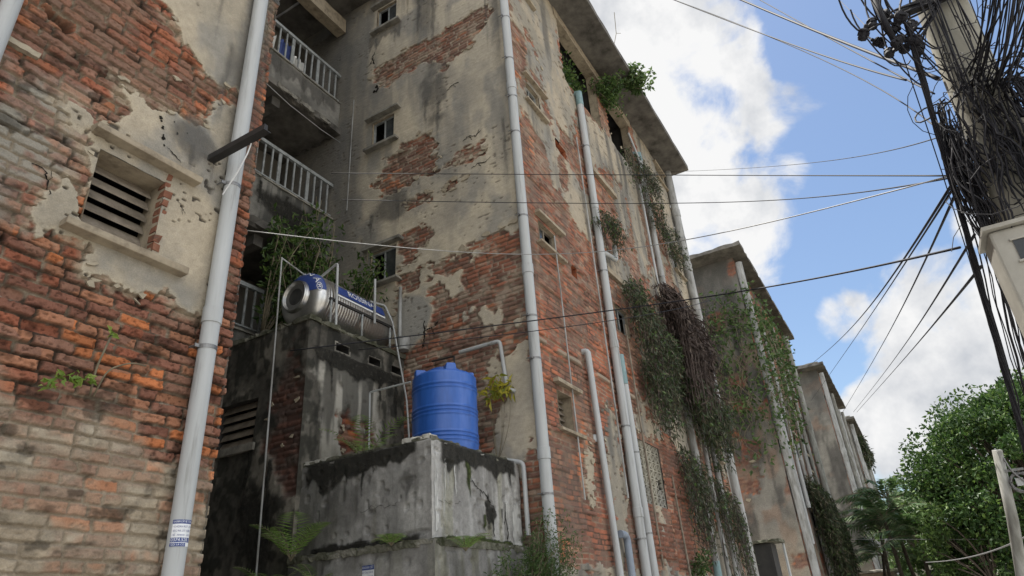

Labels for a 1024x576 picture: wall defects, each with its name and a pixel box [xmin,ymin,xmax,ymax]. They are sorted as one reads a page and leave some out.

flaking render [367,4,494,88]
flaking render [369,129,488,212]
flaking render [0,0,239,466]
flaking render [200,0,331,474]
flaking render [391,219,530,453]
leakage [238,450,284,566]
leakage [306,441,416,496]
crack [438,480,509,541]
leakage [435,440,515,531]
flaking render [519,436,547,575]